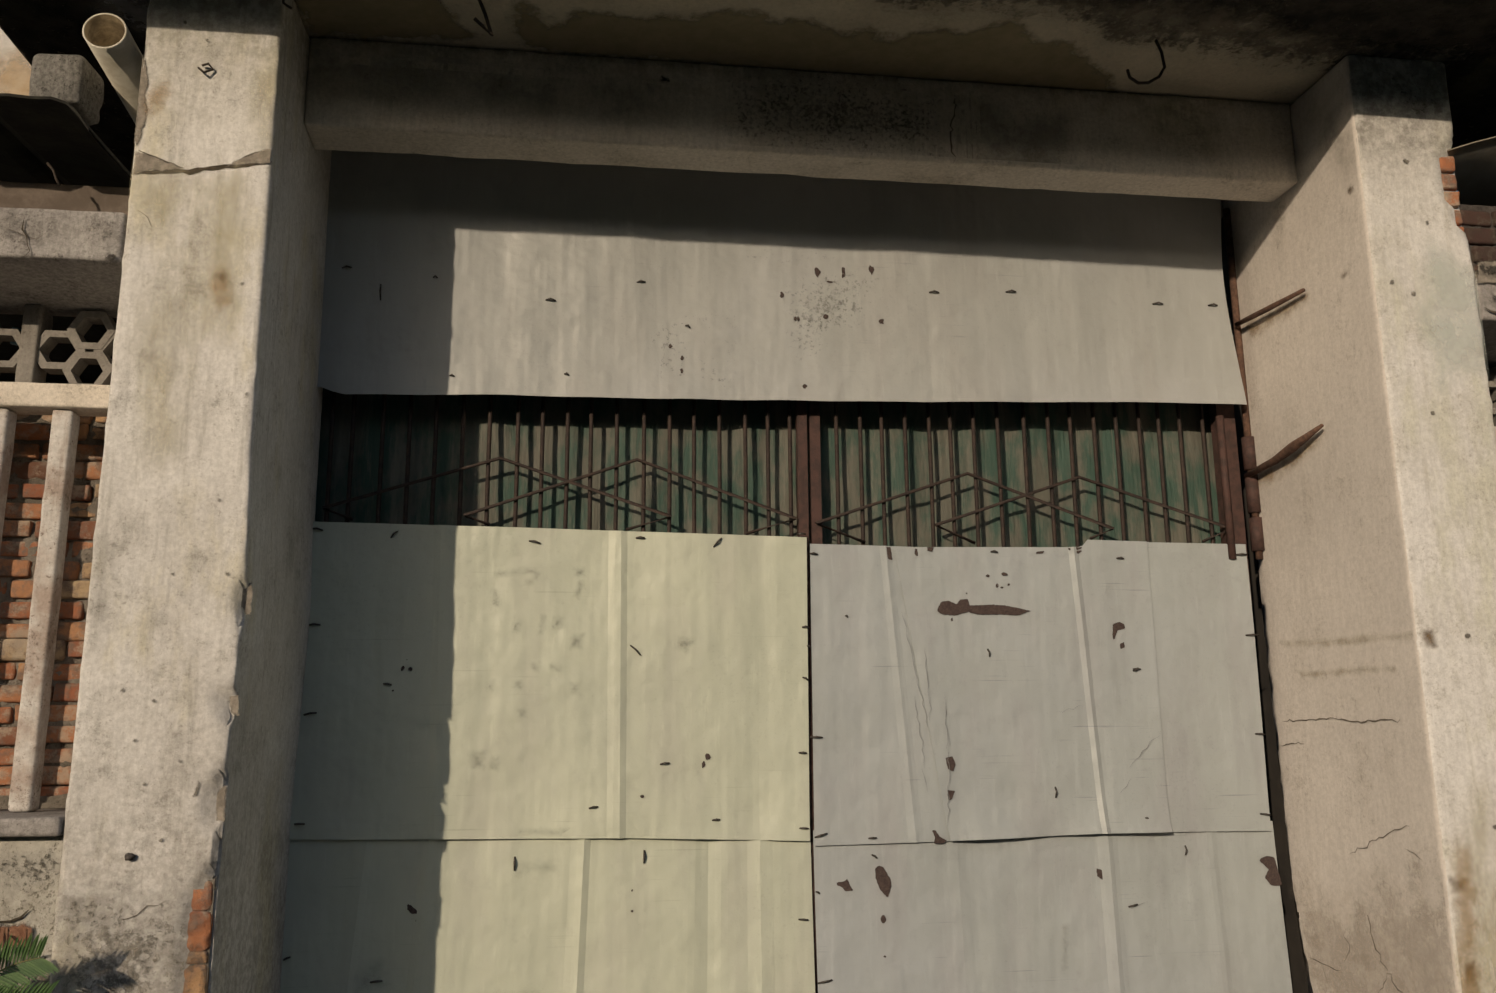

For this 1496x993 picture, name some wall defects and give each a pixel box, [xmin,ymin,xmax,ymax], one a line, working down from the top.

water stain [294,0,474,41]
water stain [0,0,150,174]
water stain [514,0,1496,155]
crack [139,150,267,175]
rust [1235,288,1305,327]
rust [1244,424,1324,478]
crack [1281,717,1396,746]
crack [1350,826,1418,857]